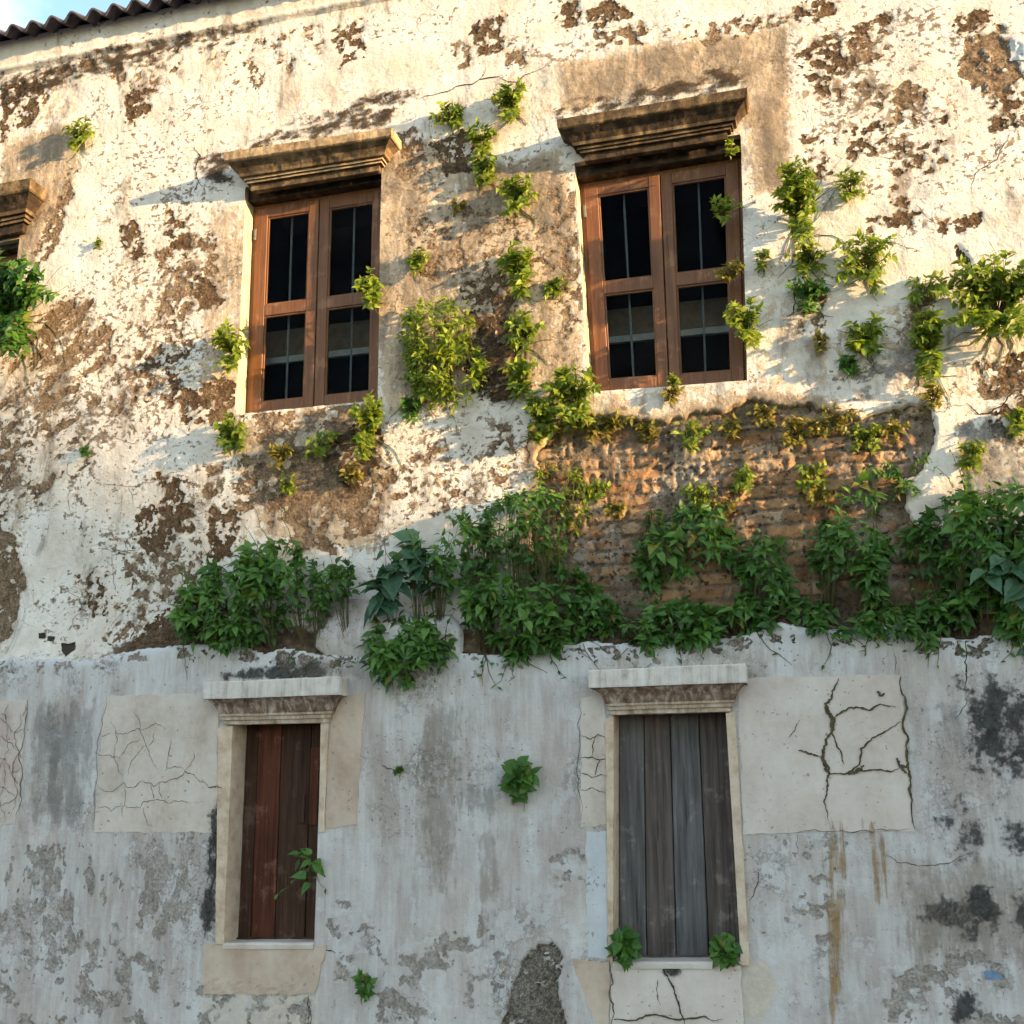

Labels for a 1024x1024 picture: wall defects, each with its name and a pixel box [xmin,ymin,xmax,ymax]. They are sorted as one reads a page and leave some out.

peeling [554,0,649,50]
peeling [795,12,949,235]
peeling [952,8,1024,132]
spalling [0,209,1009,670]
crack [789,643,975,866]
mould [952,673,1024,783]
crack [92,698,221,937]
leakage [200,806,217,931]
crack [608,961,723,1024]
rust [828,900,841,1014]
rust [872,839,886,899]
mould [916,884,1024,942]